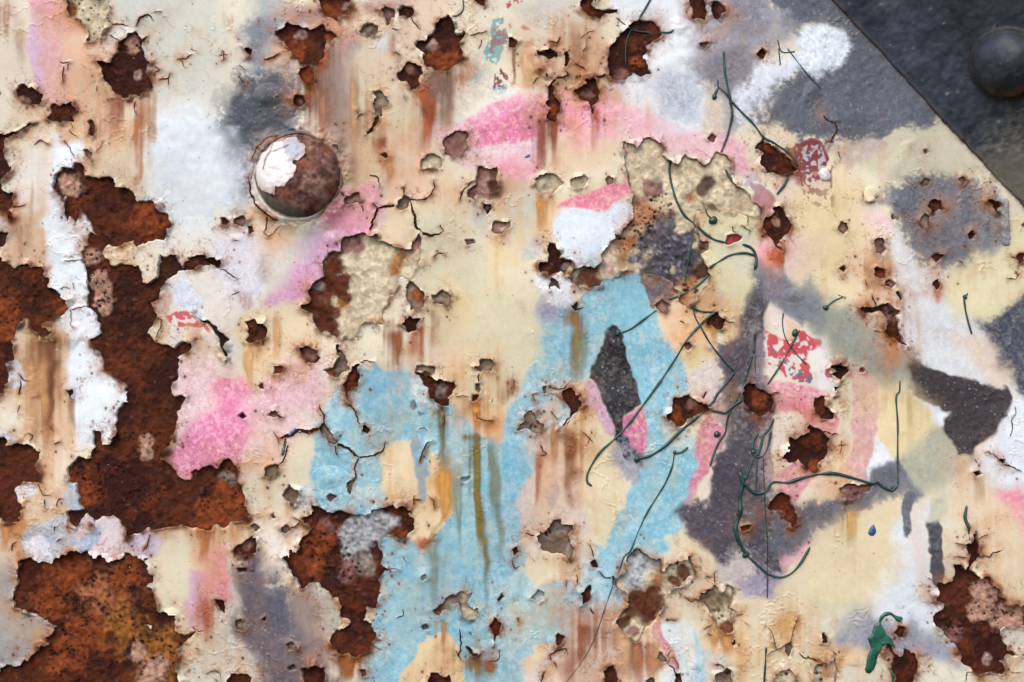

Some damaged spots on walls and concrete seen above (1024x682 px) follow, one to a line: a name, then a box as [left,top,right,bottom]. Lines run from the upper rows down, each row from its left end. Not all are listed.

rust [89,27,156,171]
crack [340,175,444,256]
rust [575,0,661,123]
peeling [548,134,761,314]
rust [754,139,797,178]
peeling [296,229,455,381]
rust [0,83,261,682]
crack [274,405,386,480]
rust [662,395,714,432]
rust [778,396,838,473]
rust [279,499,431,677]
rust [930,529,1024,677]